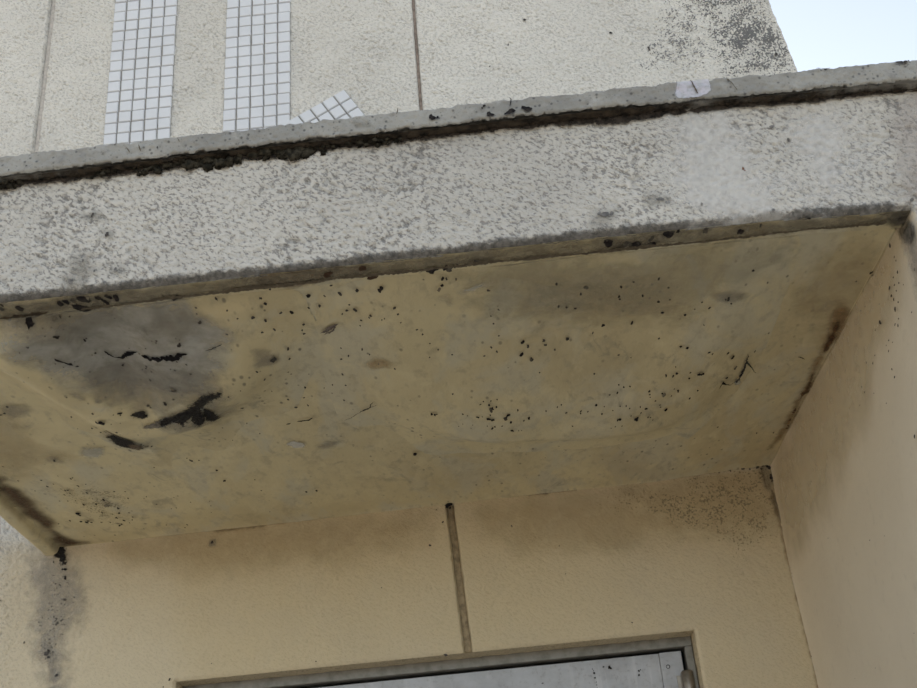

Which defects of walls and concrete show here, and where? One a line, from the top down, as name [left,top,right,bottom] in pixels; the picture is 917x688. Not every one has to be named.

leakage [0,294,228,393]
peeling [91,392,222,450]
leakage [458,399,530,432]
leakage [773,308,848,441]
leakage [0,478,130,664]